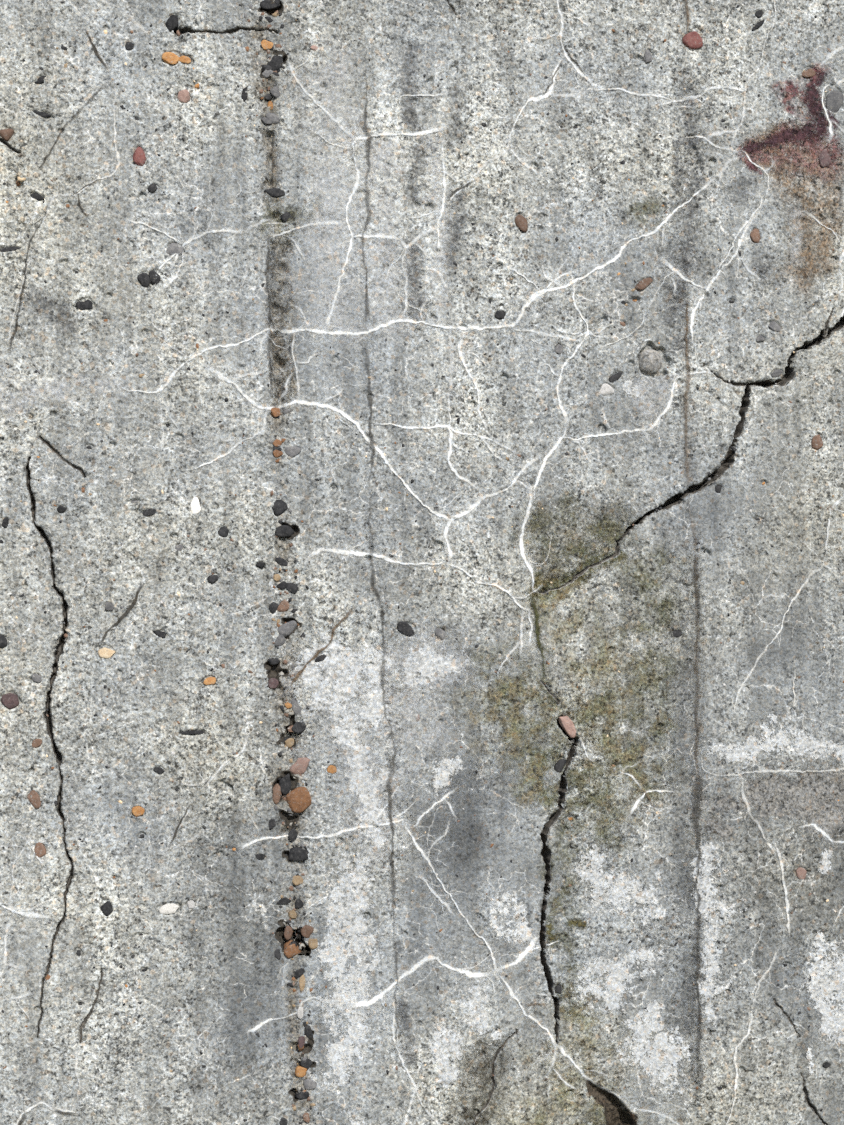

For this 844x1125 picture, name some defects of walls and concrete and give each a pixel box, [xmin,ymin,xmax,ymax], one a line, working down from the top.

rust [738,64,841,284]
crack [131,0,844,708]
crack [102,586,141,641]
crack [0,436,87,1038]
crack [624,773,671,813]
crack [15,972,105,1125]
crack [243,720,593,1125]
spalling [586,1079,637,1125]
crack [725,768,844,1125]